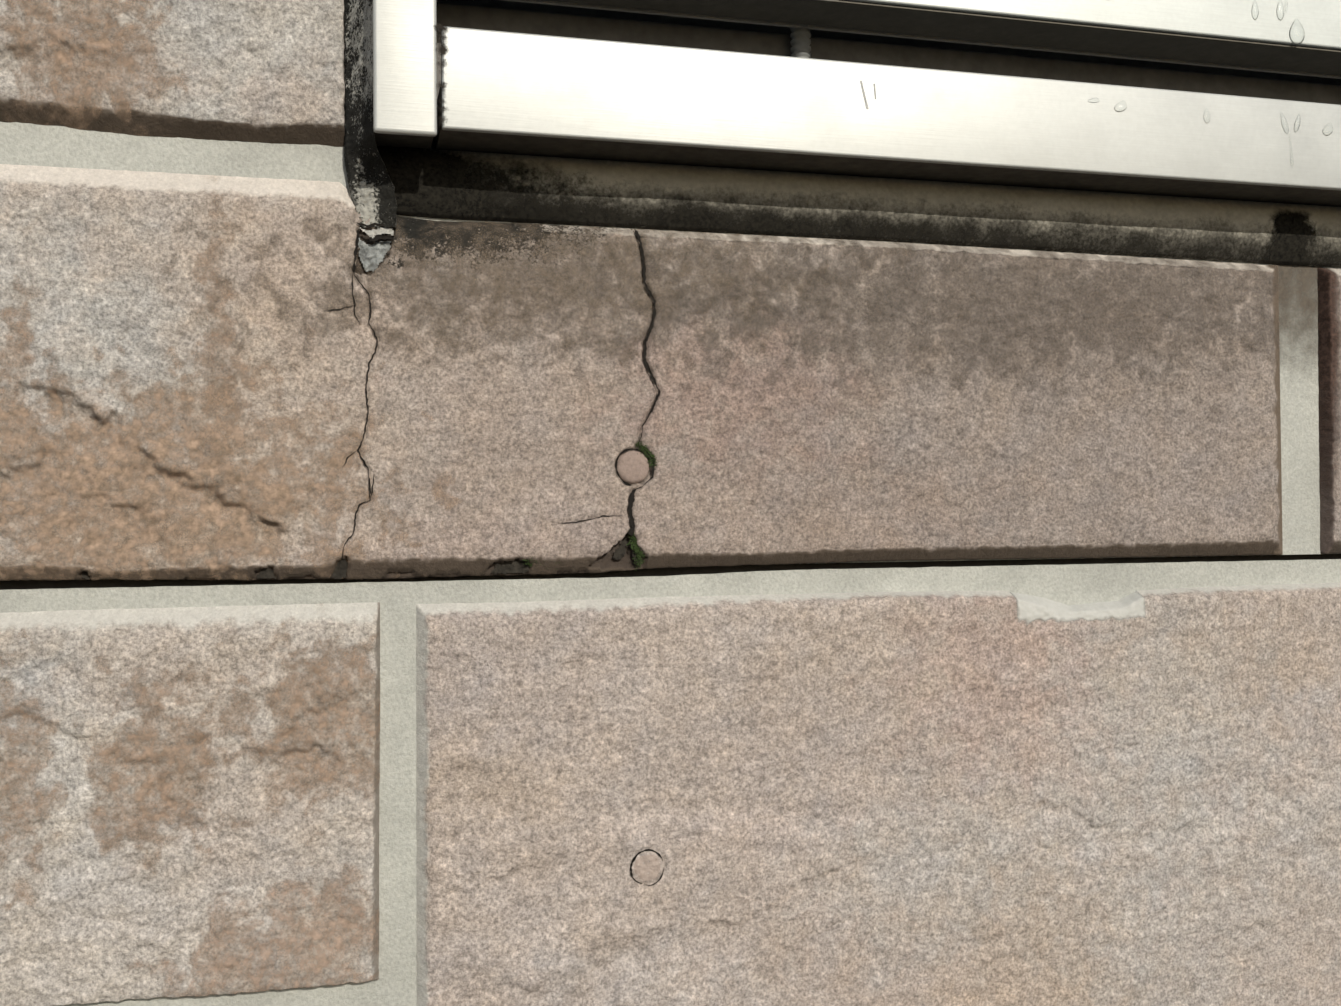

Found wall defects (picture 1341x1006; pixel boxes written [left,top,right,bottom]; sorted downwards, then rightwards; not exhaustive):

water stain [331,0,1341,364]
crack [328,272,378,565]
crack [551,229,660,536]